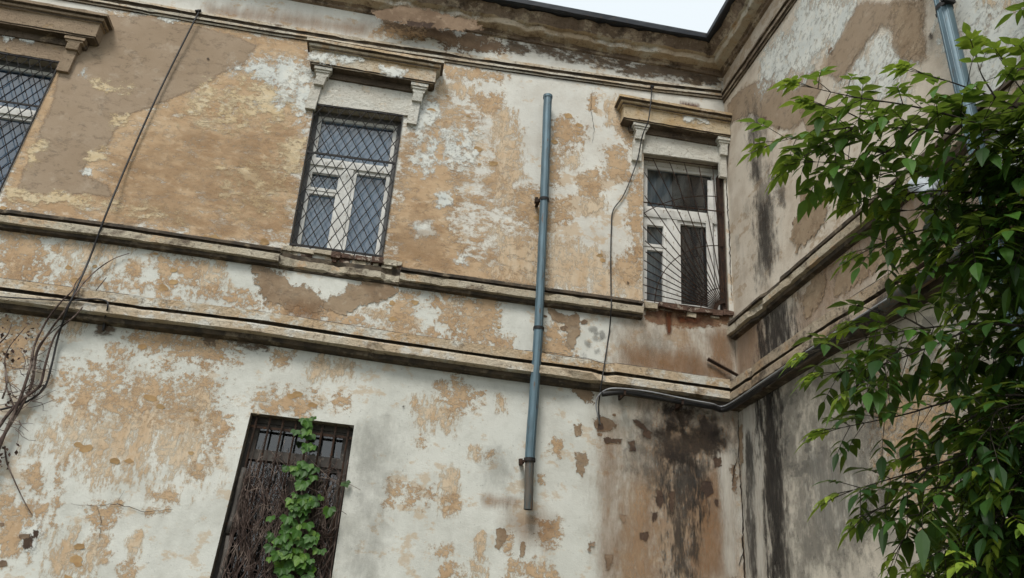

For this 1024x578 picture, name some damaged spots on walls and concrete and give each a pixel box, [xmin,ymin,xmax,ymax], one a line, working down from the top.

peeling [757,0,945,109]
peeling [954,0,1024,104]
peeling [0,15,364,247]
peeling [369,5,730,329]
water stain [755,193,774,271]
spalling [789,188,830,253]
peeling [0,230,515,349]
peeling [0,329,244,578]
peeling [382,467,462,518]
peeling [434,516,564,578]
peeling [549,436,589,477]
water stain [622,392,783,578]